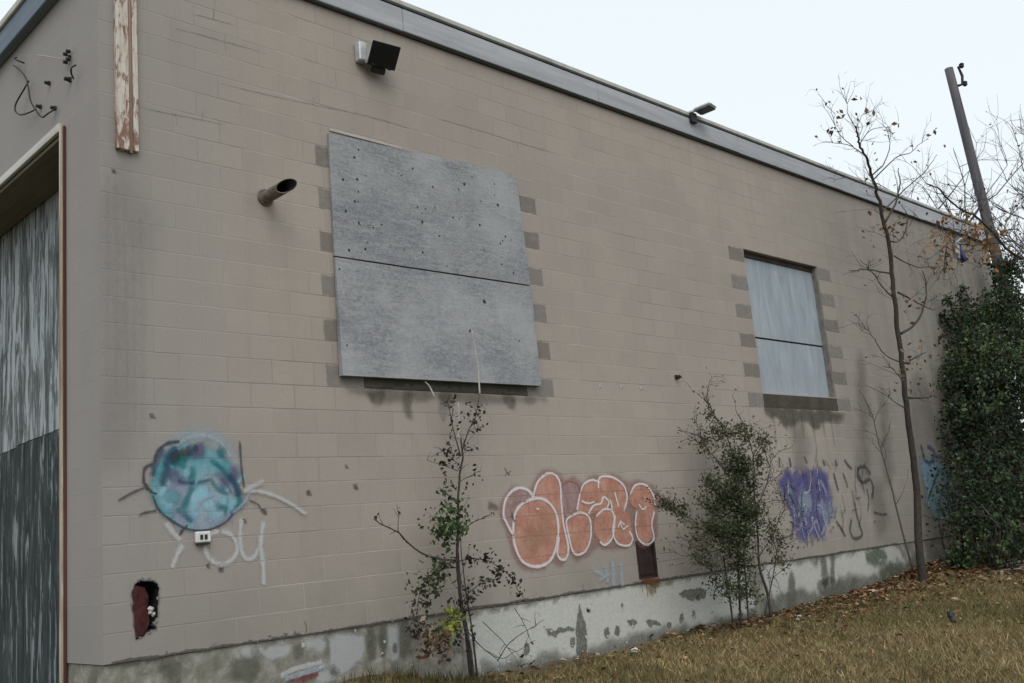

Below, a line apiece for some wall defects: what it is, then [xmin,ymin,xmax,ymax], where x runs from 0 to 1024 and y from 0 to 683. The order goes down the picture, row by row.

water stain [765,405,841,428]
spalling [130,577,159,639]